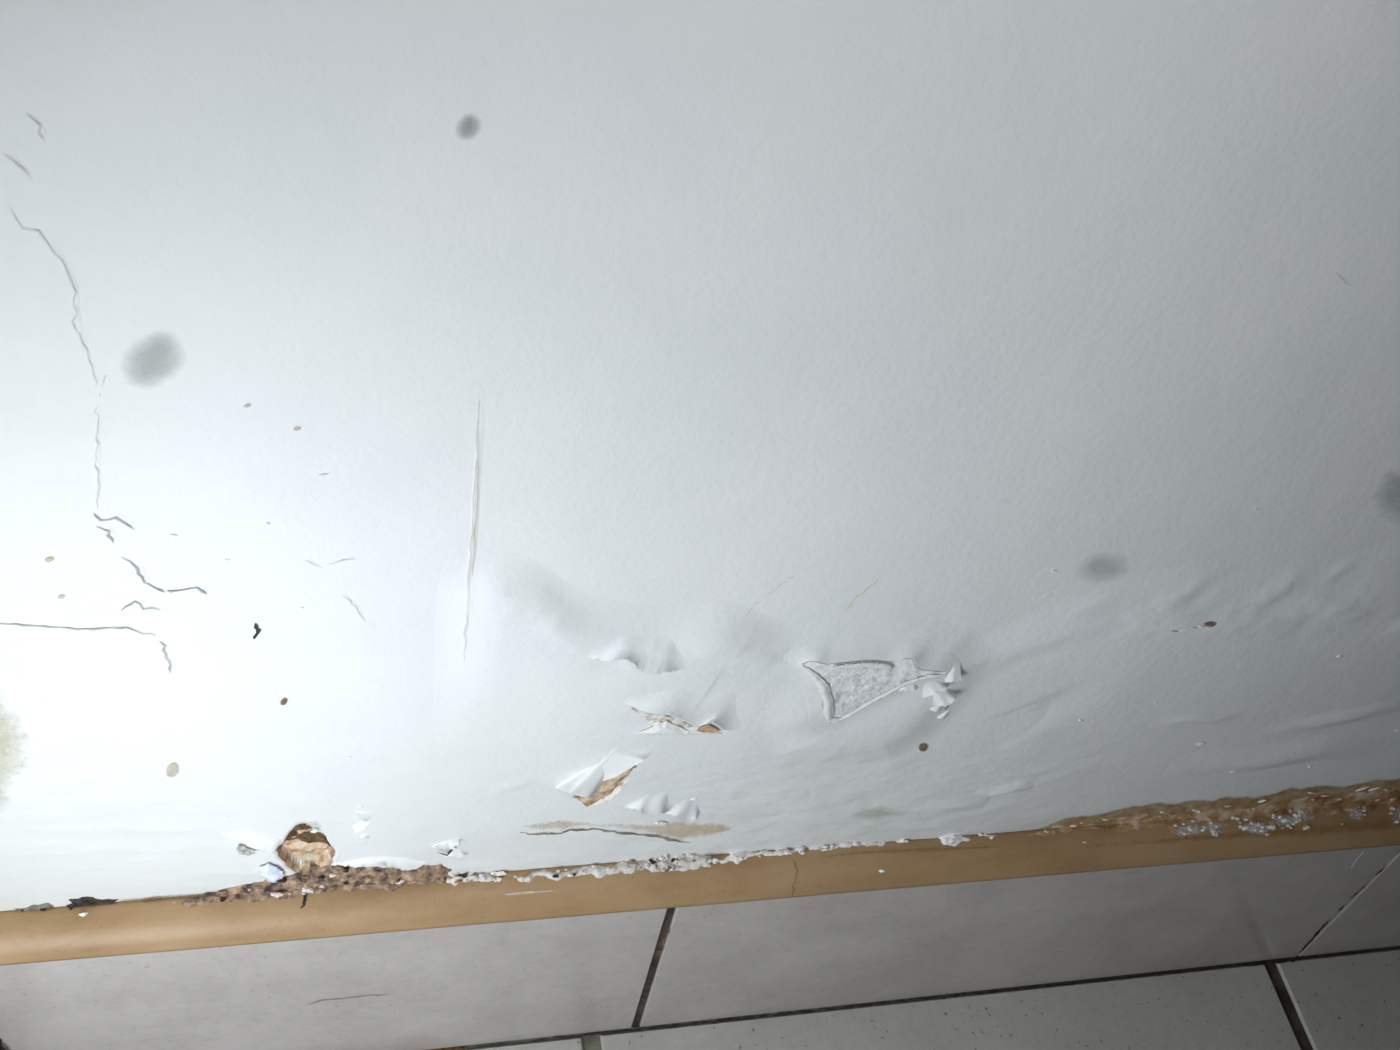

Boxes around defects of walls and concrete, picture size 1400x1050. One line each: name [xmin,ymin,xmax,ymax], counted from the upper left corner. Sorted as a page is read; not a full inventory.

crack [5,114,47,179]
crack [0,208,208,673]
crack [463,403,484,658]
peeling [555,633,743,822]
peeling [783,634,963,731]
flaking render [166,823,909,909]